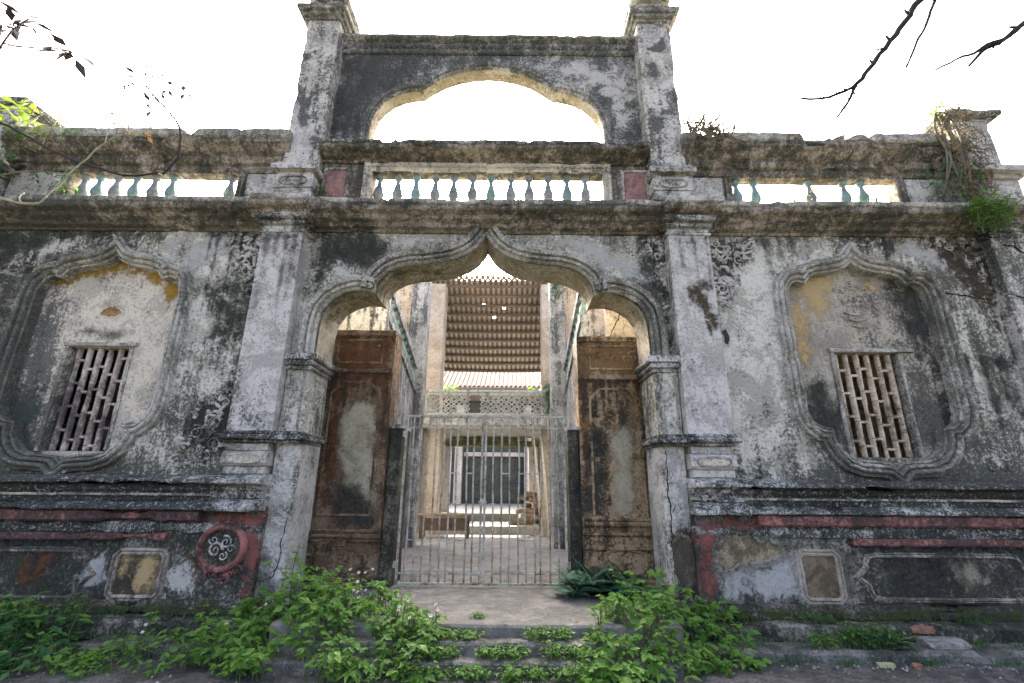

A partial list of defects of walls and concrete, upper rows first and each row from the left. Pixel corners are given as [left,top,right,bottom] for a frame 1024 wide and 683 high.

damp [0,230,110,334]
damp [55,262,178,309]
peeling [687,281,731,358]
peeling [790,276,835,370]
damp [805,378,854,452]
crack [258,519,287,582]
crack [665,451,679,578]
spalling [672,515,792,603]